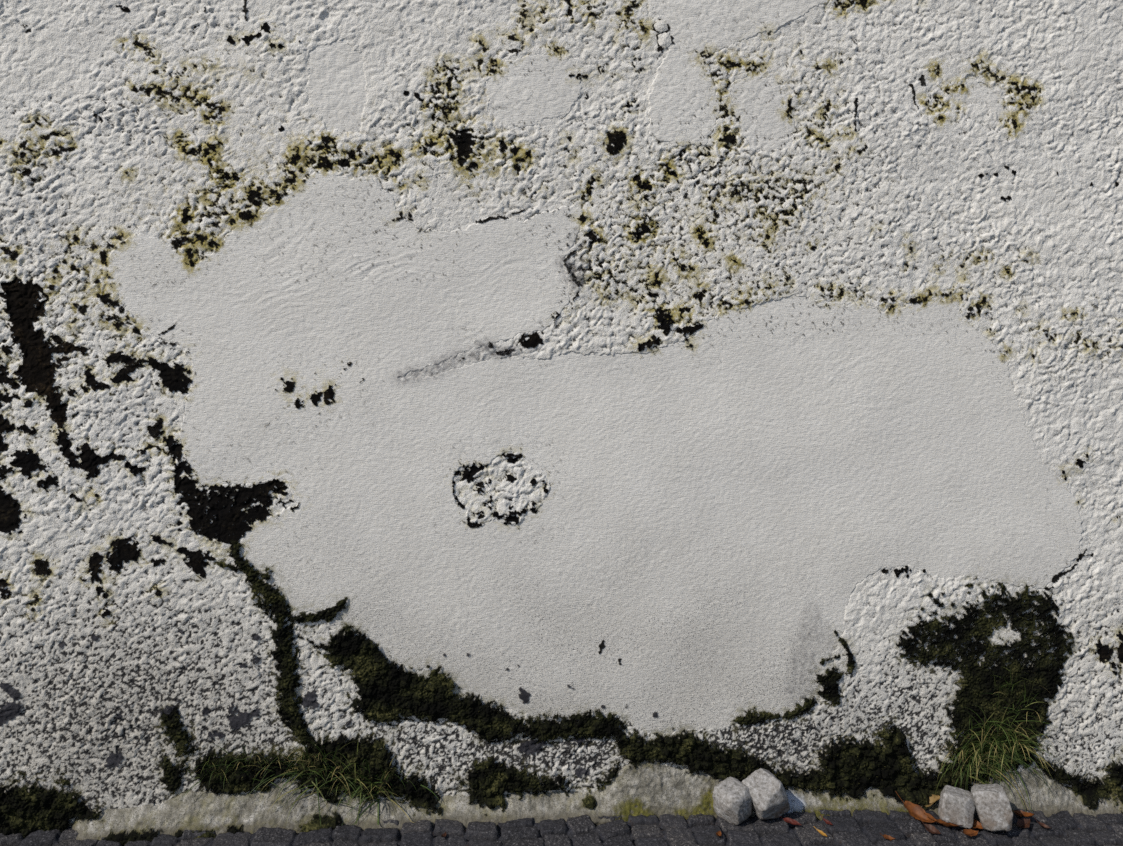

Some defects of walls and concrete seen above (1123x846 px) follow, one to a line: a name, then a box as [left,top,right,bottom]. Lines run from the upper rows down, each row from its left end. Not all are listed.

damp [561,0,654,73]
damp [833,0,876,15]
damp [0,115,77,192]
damp [120,0,549,272]
damp [560,22,868,358]
damp [919,62,968,150]
damp [969,56,1041,137]
damp [814,249,1033,334]
damp [460,331,544,361]
damp [0,228,300,620]
spalling [464,465,550,526]
damp [1089,631,1123,675]